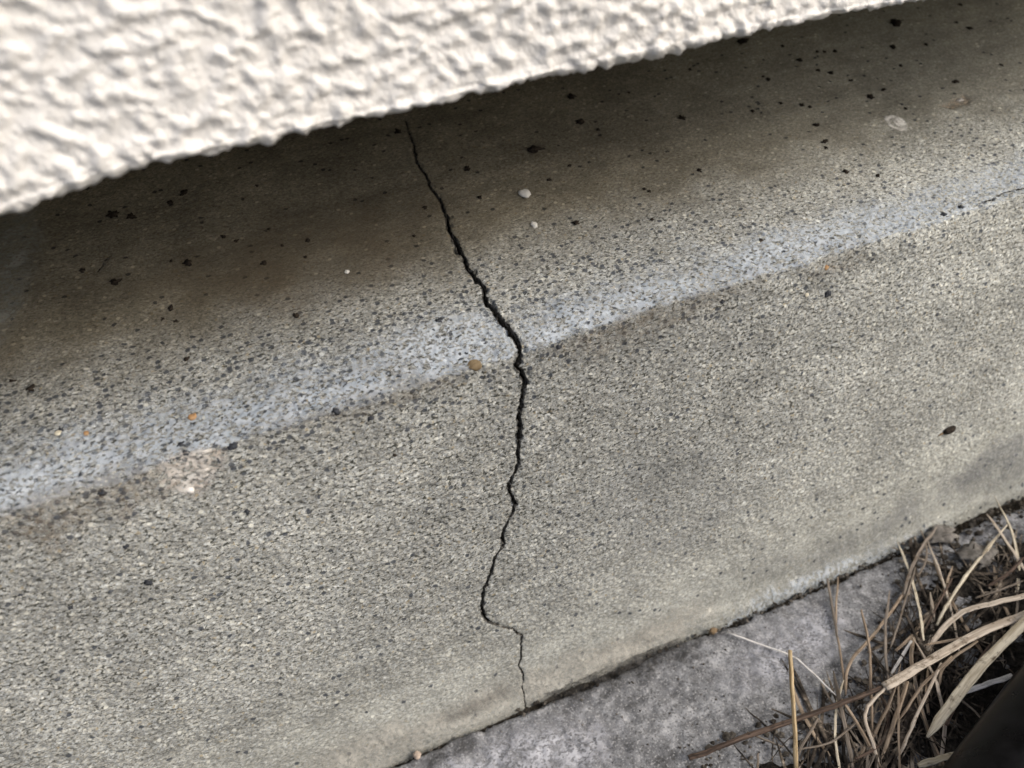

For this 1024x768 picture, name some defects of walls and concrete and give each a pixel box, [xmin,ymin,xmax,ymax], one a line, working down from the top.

crack [405,121,652,732]
crack [689,499,1024,641]
crack [391,743,448,768]